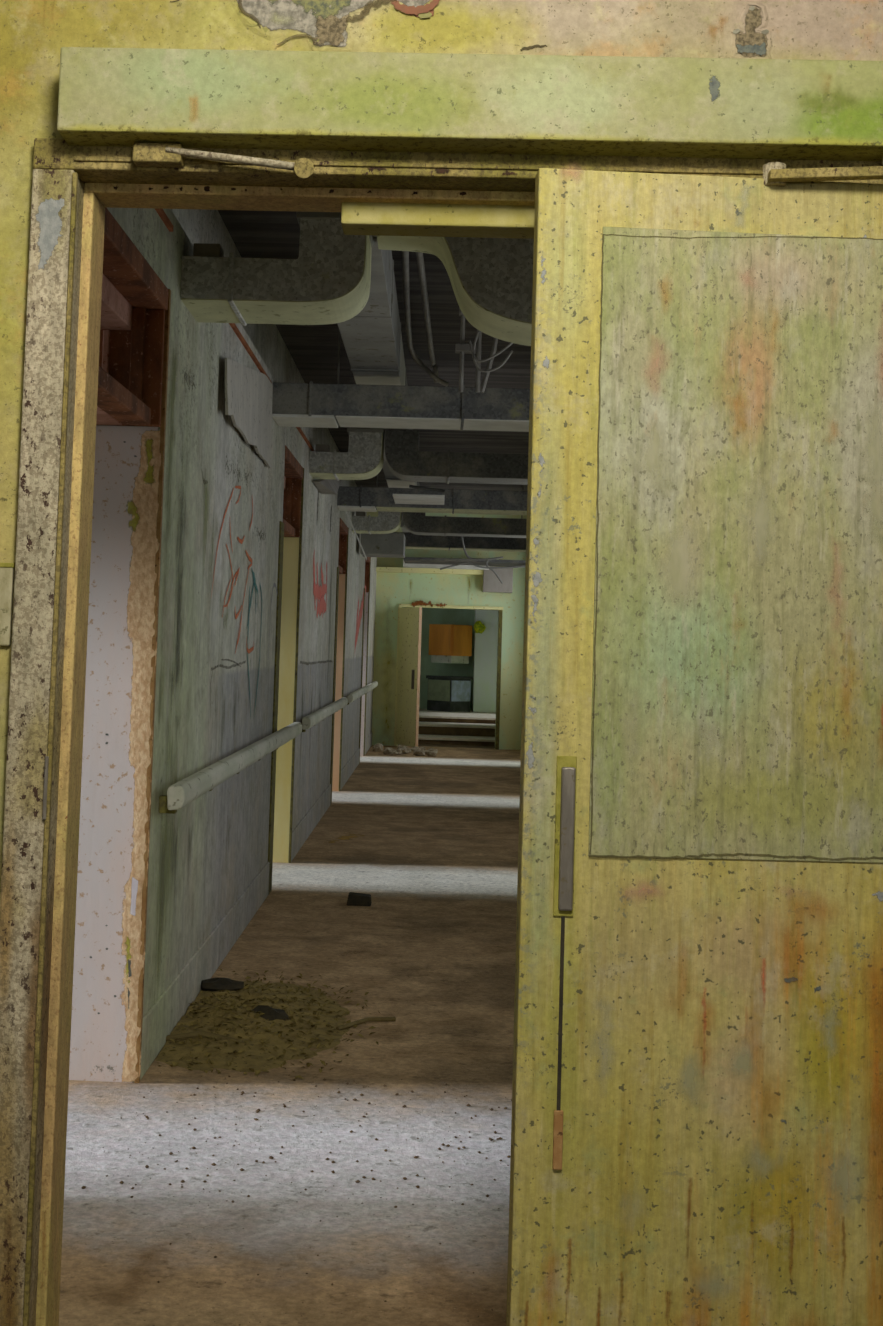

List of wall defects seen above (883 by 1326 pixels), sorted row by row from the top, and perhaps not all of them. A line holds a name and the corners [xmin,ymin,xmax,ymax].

peeling [227,0,444,52]
crack [233,425,265,467]